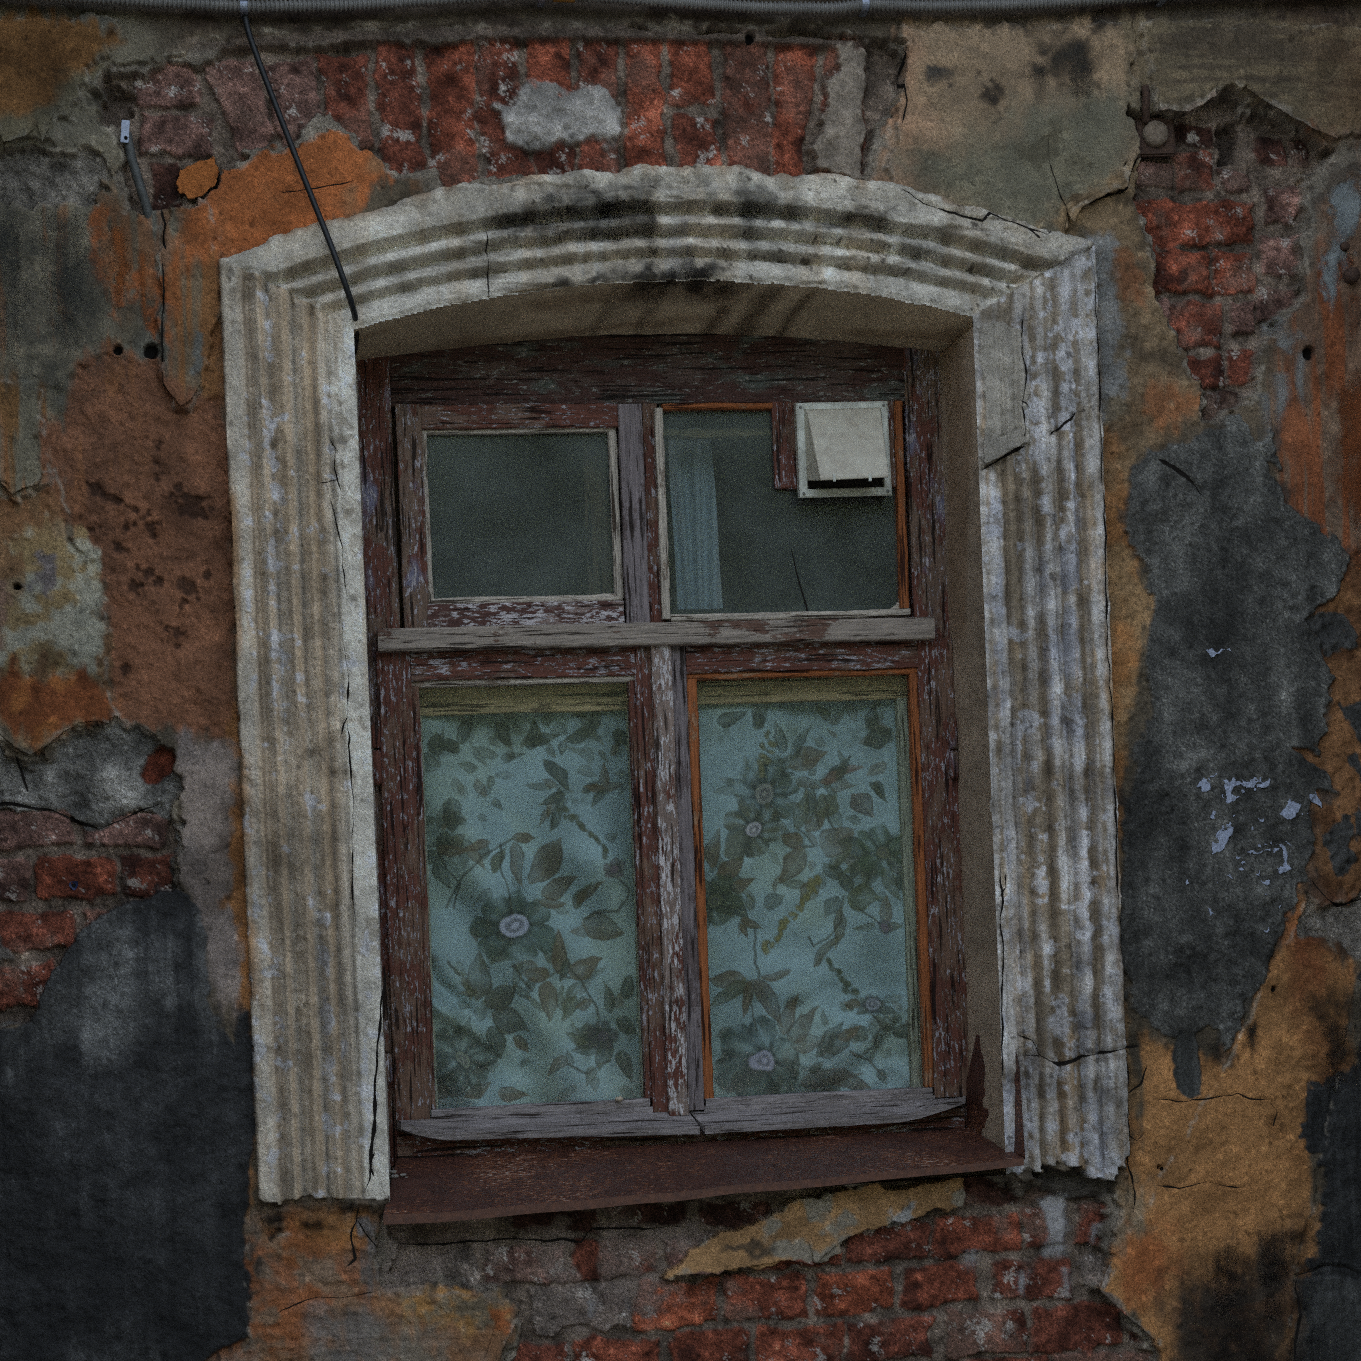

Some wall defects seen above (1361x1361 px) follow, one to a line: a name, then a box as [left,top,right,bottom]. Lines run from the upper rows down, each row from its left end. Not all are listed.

flaking render [0,12,1361,425]
leakage [632,218,732,295]
crack [901,140,1140,238]
peeling [0,379,187,1029]
crack [982,256,1123,956]
flaking render [228,891,1361,1361]
crack [1000,868,1277,1212]